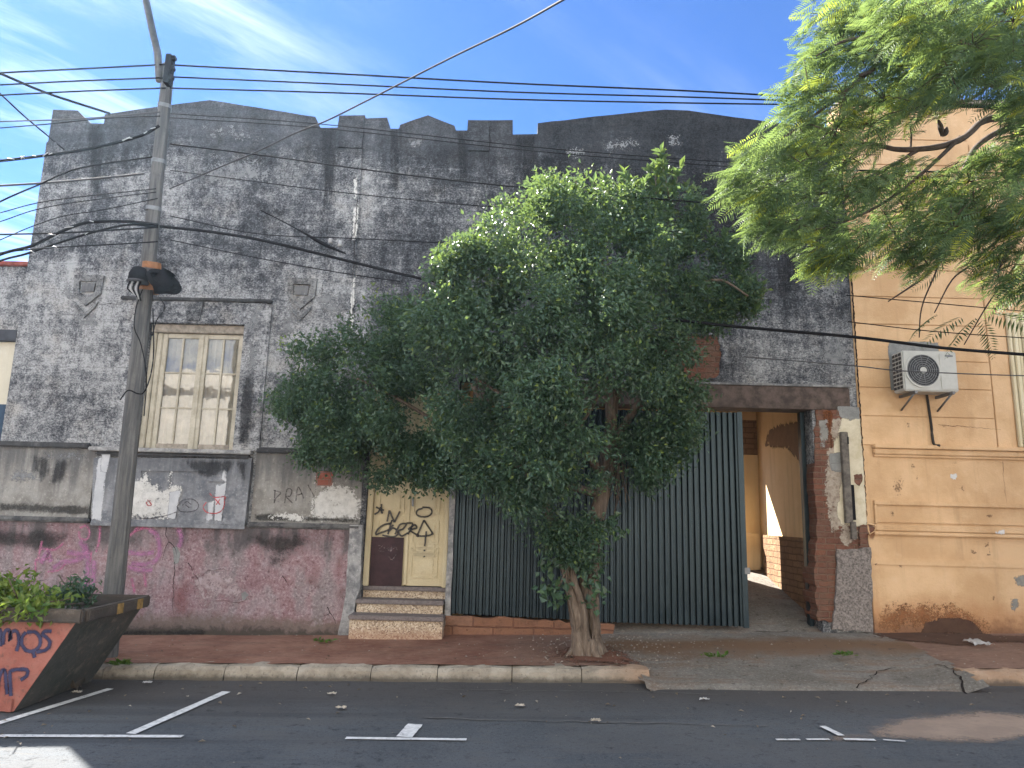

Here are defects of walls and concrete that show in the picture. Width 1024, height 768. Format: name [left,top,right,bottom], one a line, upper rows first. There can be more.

damp [240,377,252,442]
spalling [742,420,799,460]
damp [0,454,110,521]
peeling [131,470,182,520]
peeling [268,471,362,523]
peeling [824,418,876,547]
crack [162,527,199,607]
damp [921,618,983,634]